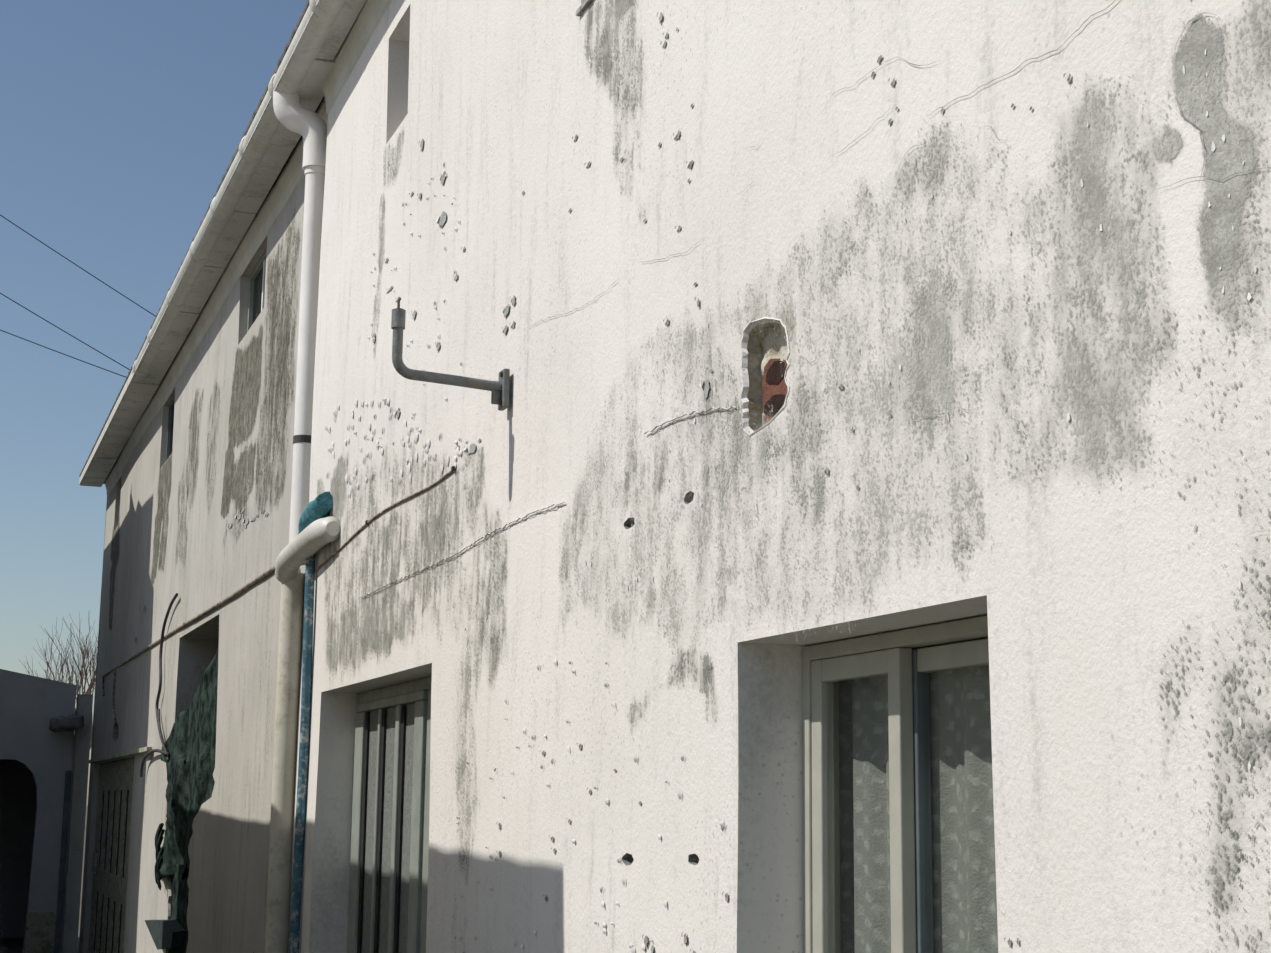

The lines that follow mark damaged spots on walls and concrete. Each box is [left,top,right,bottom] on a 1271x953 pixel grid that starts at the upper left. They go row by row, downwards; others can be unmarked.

leakage [583,0,643,190]
crack [820,57,934,116]
crack [895,0,1116,176]
leakage [151,225,301,585]
leakage [624,428,670,529]
peeling [558,0,1271,953]
leakage [317,446,508,896]